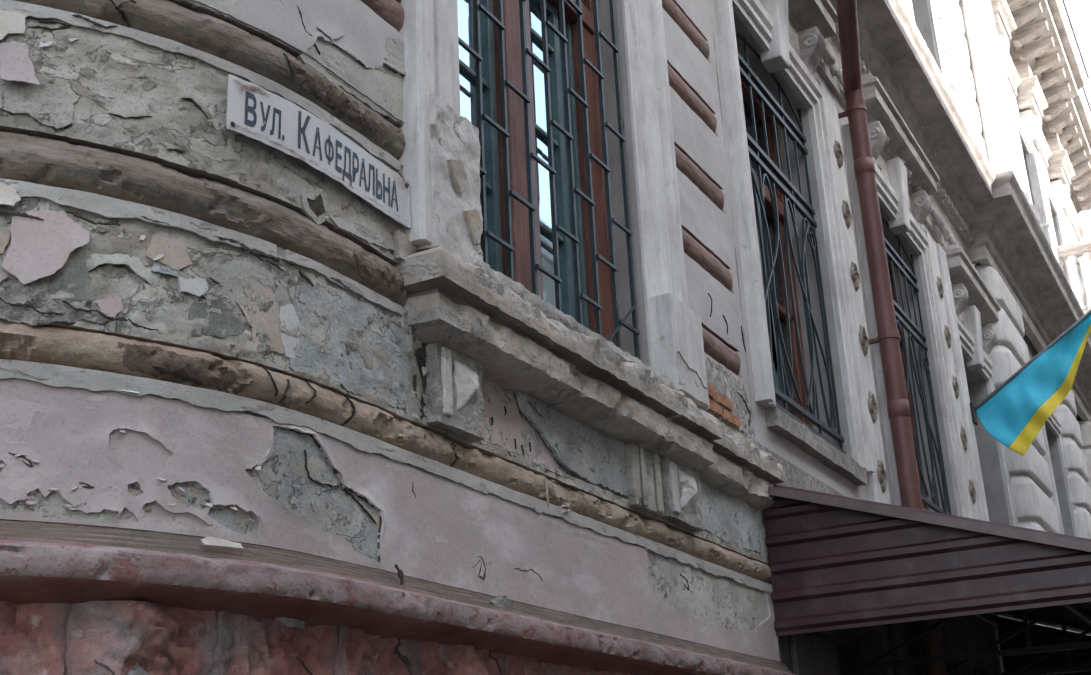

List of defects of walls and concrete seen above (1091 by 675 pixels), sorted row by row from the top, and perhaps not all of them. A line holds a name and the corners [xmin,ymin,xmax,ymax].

peeling [0,3,53,85]
peeling [0,182,164,331]
peeling [25,429,258,538]
spalling [117,342,254,394]
spalling [177,275,252,339]
peeling [251,427,378,561]
spalling [301,188,331,225]
crack [259,364,387,563]
flaking render [289,277,428,420]
peeling [514,390,628,497]
spalling [676,352,753,438]
crack [94,660,115,675]